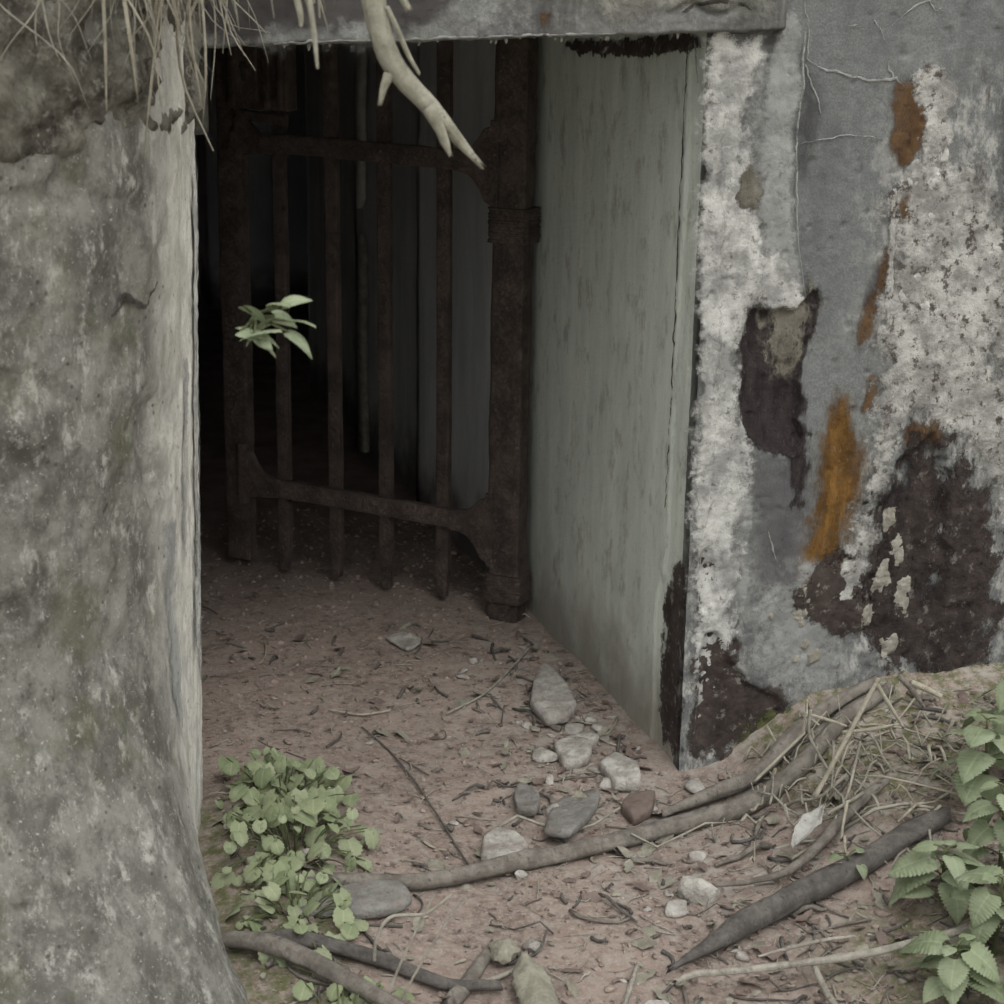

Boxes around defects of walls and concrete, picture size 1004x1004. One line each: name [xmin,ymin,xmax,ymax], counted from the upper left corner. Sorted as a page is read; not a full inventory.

leakage [201,0,368,48]
crack [682,0,752,13]
crack [801,134,882,144]
crack [804,0,941,114]
rust [889,65,931,167]
leakage [688,0,853,718]
spalling [734,277,824,459]
rust [858,246,894,345]
leakage [839,64,1004,601]
rust [799,396,866,584]
spalling [792,417,1004,676]
spalling [658,551,789,761]